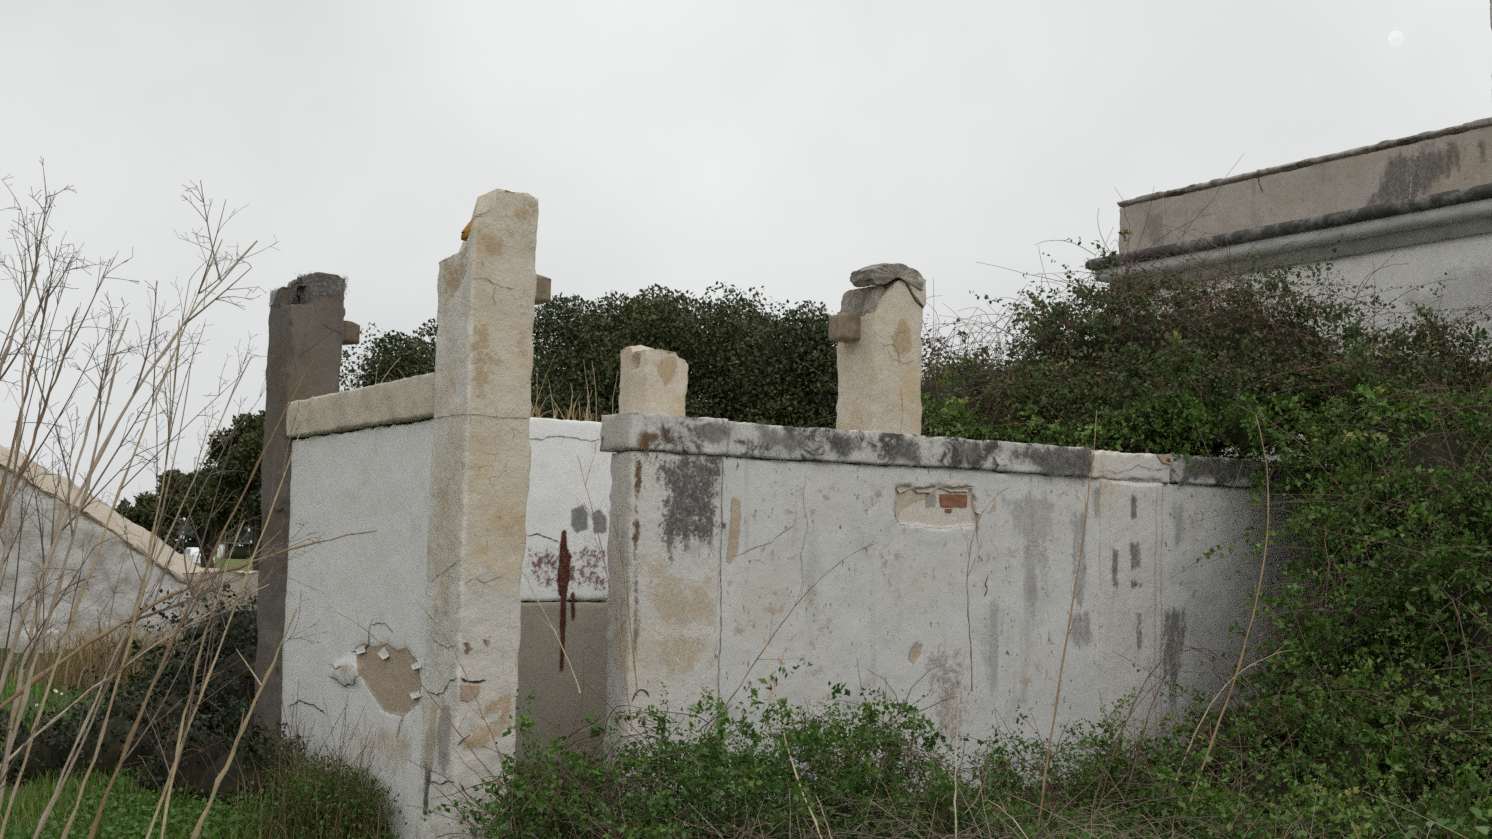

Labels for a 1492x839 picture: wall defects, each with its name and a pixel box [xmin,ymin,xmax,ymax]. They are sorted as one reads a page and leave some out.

leakage [1366,142,1460,207]
leakage [757,421,809,451]
leakage [827,430,857,458]
leakage [888,434,923,467]
leakage [1011,443,1094,480]
leakage [643,421,739,560]
flaking render [864,482,981,539]
leakage [1112,542,1142,588]
corrosion [557,530,575,671]
flaking render [355,643,421,716]
leakage [1162,609,1186,693]